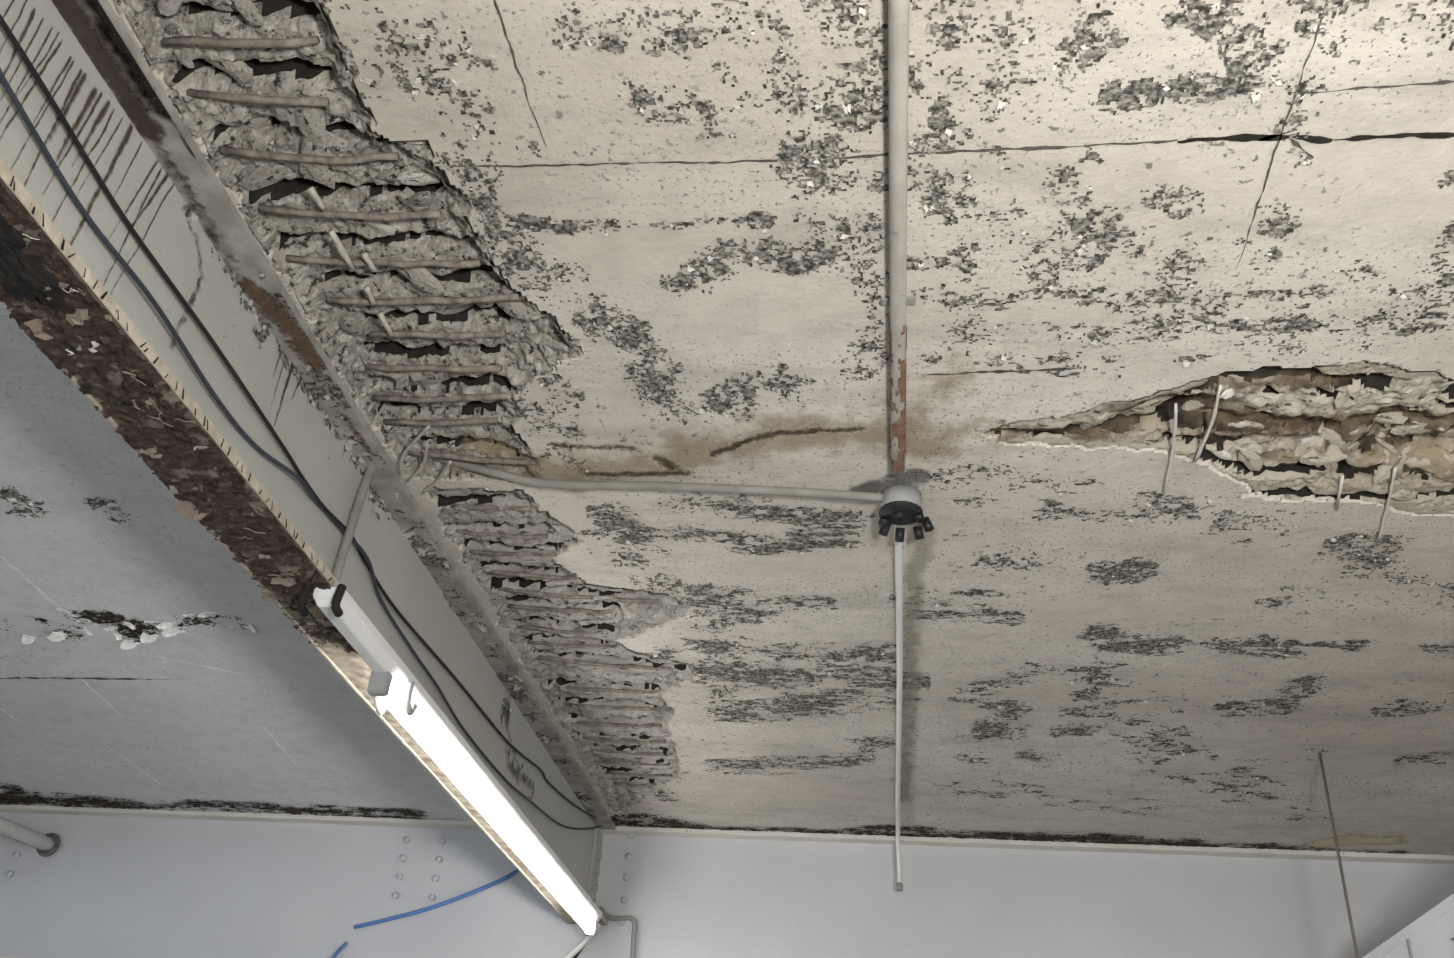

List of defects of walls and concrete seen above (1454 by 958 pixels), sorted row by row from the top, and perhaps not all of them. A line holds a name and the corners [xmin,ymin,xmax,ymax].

crack [439,0,1454,269]
spalling [907,0,1454,609]
peeling [65,341,99,355]
spalling [114,0,931,825]
corrosion [889,325,907,475]
damp [1007,373,1454,442]
peeling [0,485,50,520]
peeling [82,497,130,527]
damp [850,469,932,493]
peeling [887,587,1026,626]
peeling [932,622,1378,821]
peeling [1368,692,1454,718]